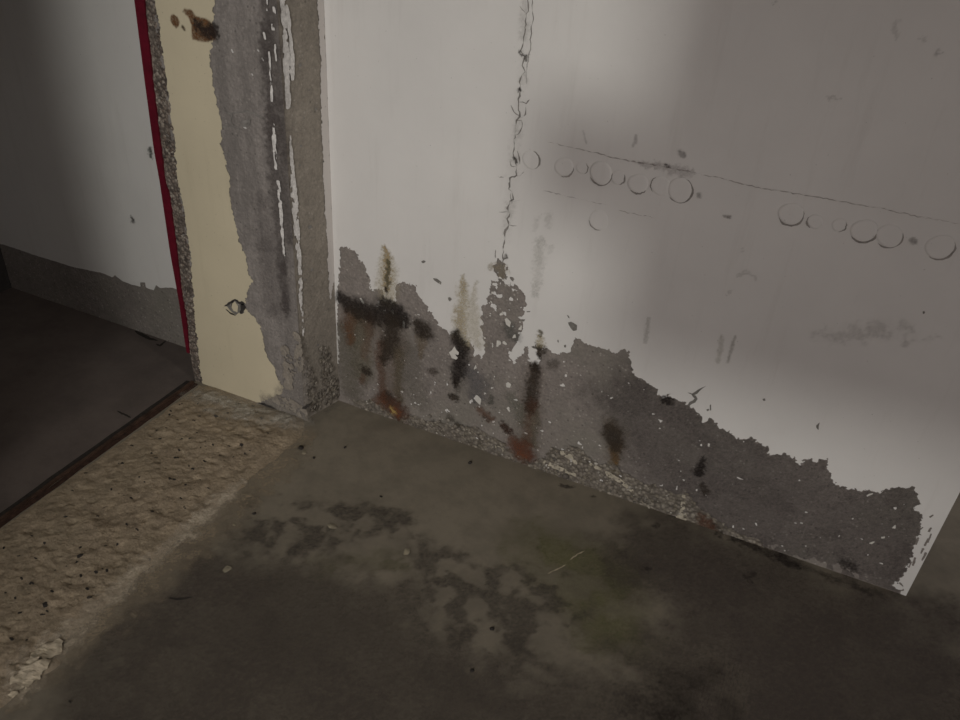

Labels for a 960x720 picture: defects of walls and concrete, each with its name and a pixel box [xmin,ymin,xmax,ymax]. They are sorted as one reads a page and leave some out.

corrosion [171,9,220,42]
crack [495,0,534,286]
corrosion [336,246,433,420]
corrosion [480,409,533,461]
corrosion [524,330,547,431]
peeling [210,0,934,594]
corrosion [602,422,623,465]
leakage [58,505,687,720]